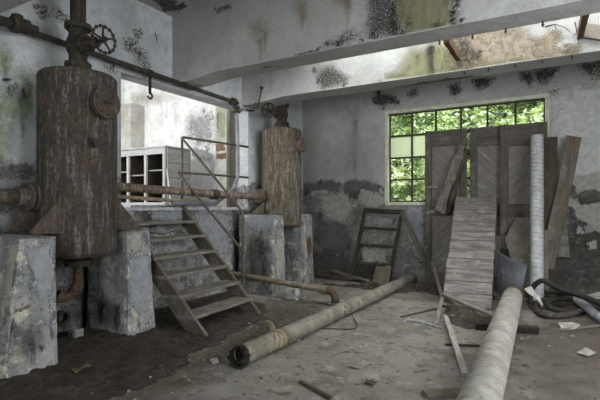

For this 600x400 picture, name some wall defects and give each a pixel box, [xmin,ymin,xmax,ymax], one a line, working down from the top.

leakage [367,0,464,39]
leakage [388,27,563,79]
leakage [312,66,347,88]
leakage [372,90,400,109]
leakage [448,81,462,100]
leakage [471,77,495,91]
leakage [519,66,559,87]
peeling [568,172,600,252]